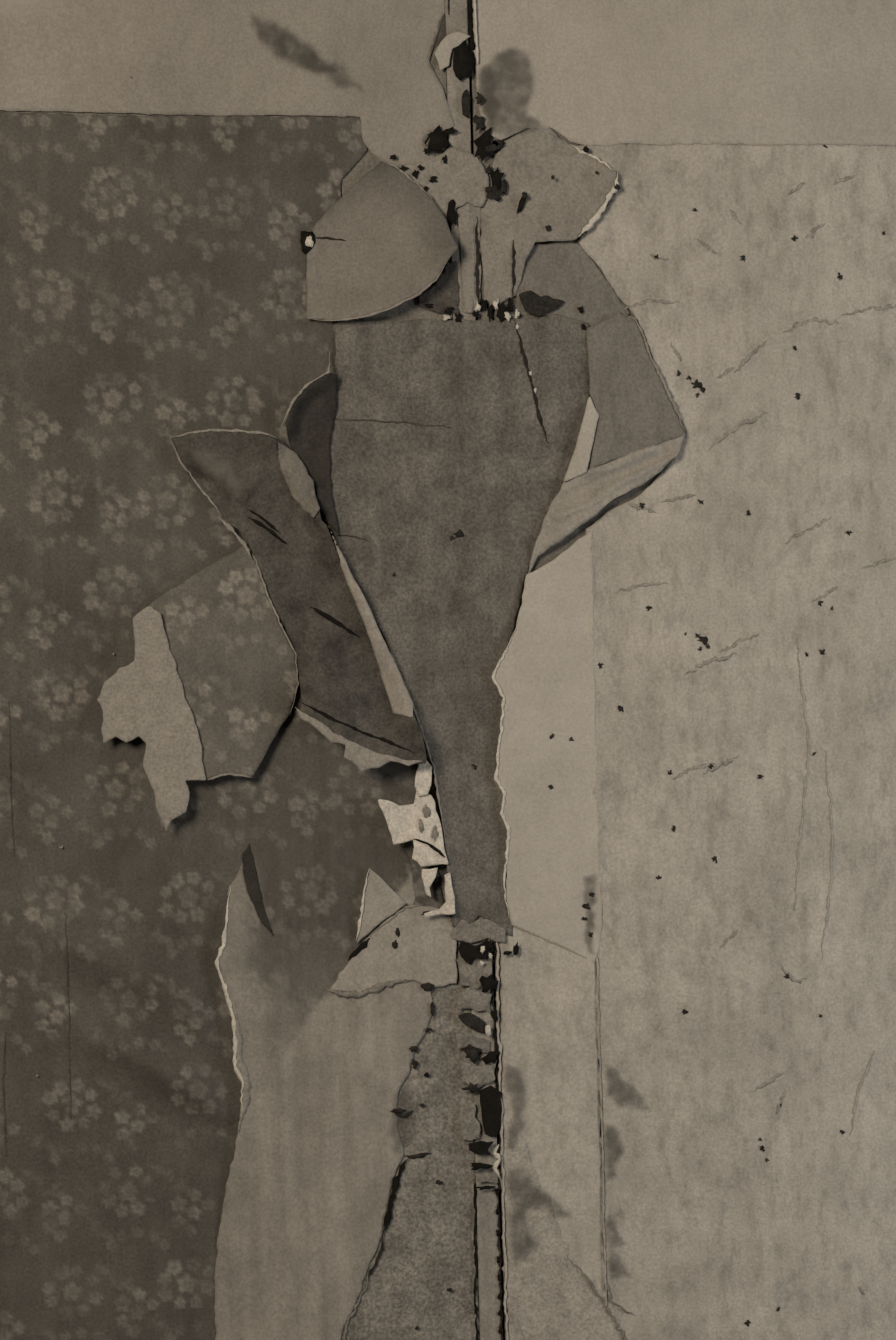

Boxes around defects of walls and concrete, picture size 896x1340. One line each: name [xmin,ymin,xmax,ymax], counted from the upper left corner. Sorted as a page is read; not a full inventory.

water stain [260,28,345,84]
spalling [389,32,528,214]
spalling [447,199,458,227]
spalling [418,261,586,330]
spalling [341,940,624,1340]
crack [567,1255,634,1340]